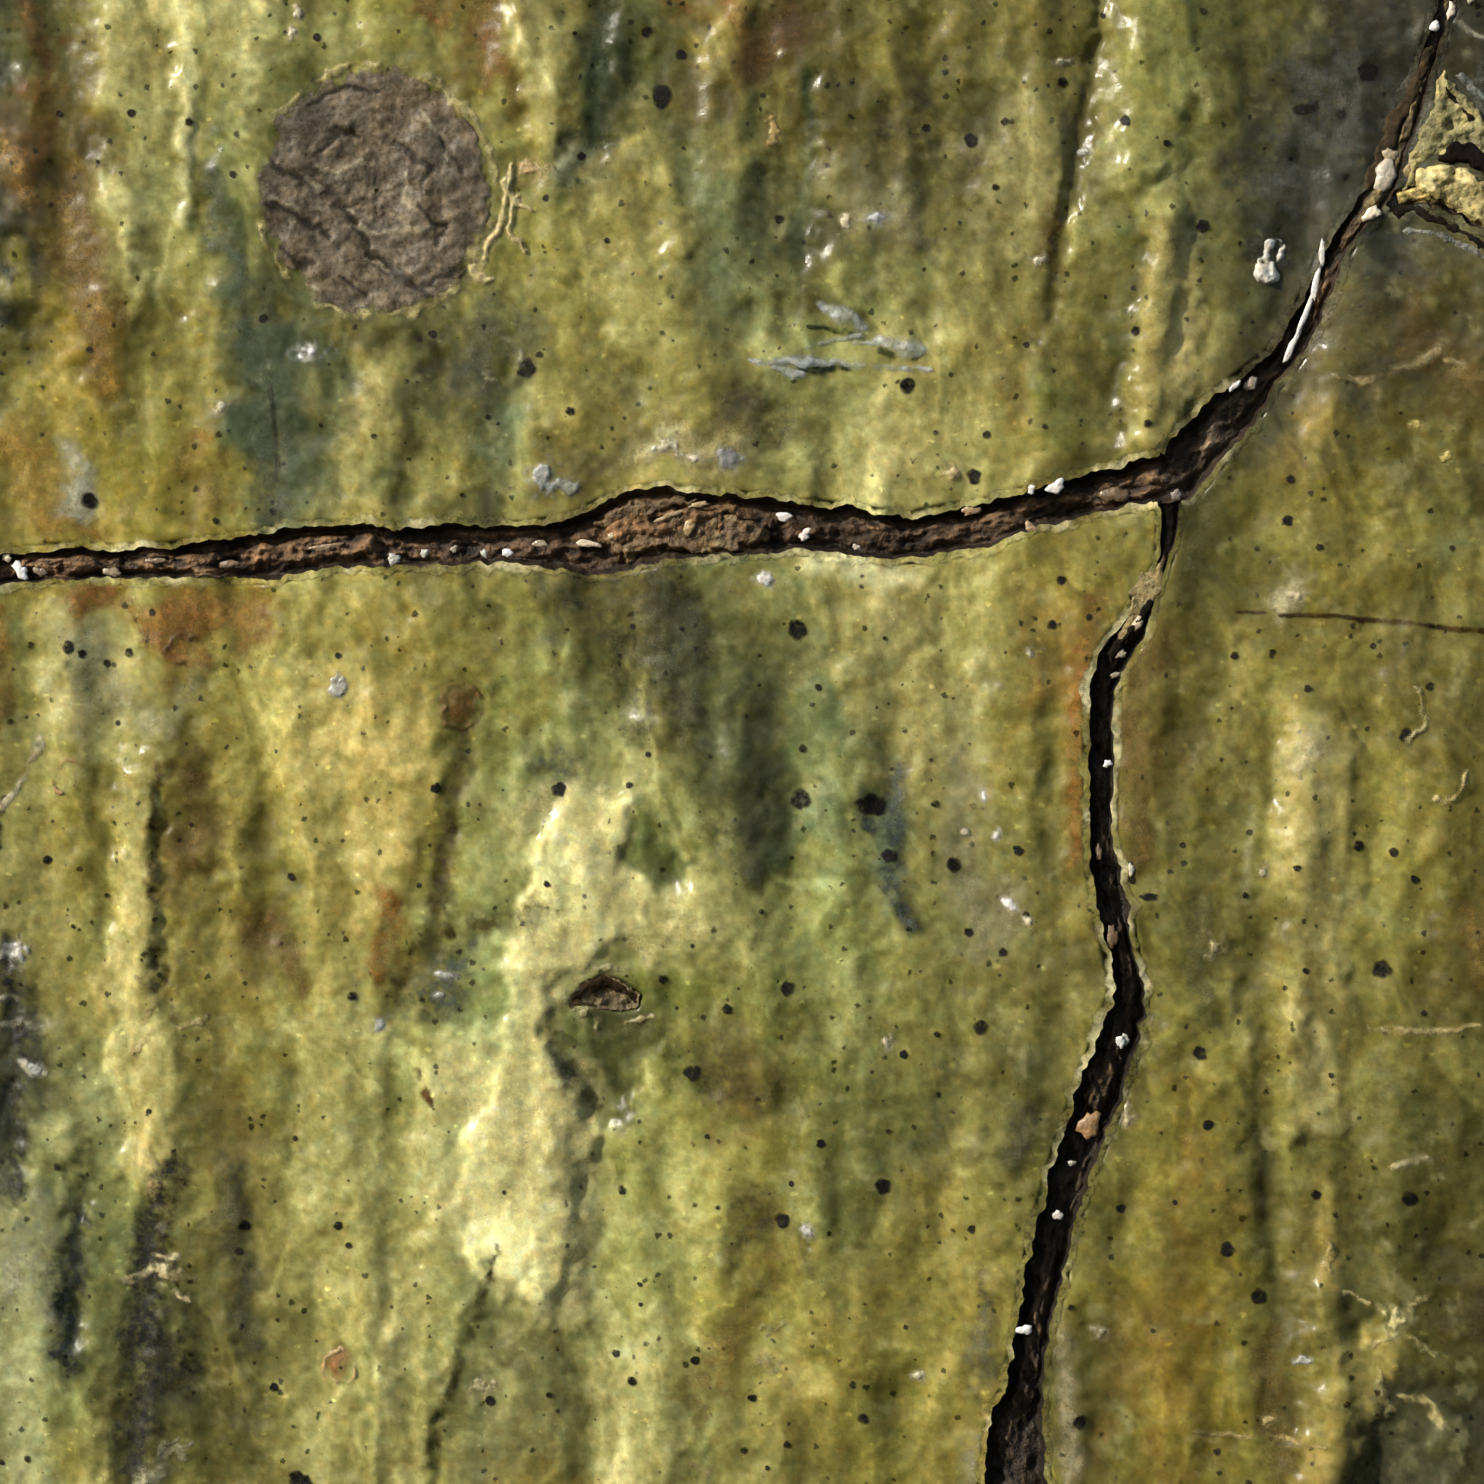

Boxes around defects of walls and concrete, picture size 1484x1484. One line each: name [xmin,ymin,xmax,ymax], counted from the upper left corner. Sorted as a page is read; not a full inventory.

crack [0,0,1484,639]
hole [568,963,654,1031]
crack [975,203,1389,1484]
water stain [107,1159,202,1484]
water stain [219,1155,265,1354]
crack [431,1350,457,1464]